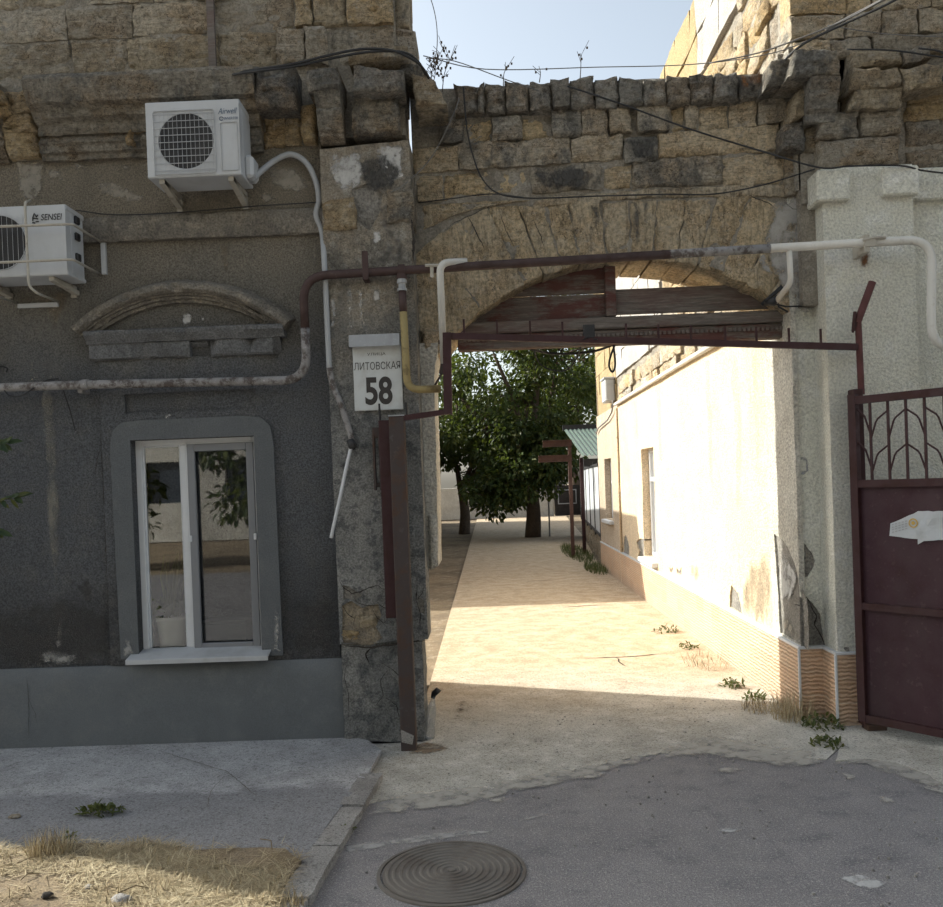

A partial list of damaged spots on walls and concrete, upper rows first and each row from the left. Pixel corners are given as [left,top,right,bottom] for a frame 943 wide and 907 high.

flaking render [342,585,382,645]
crack [340,582,427,721]
spalling [731,588,742,613]
spalling [776,536,824,650]